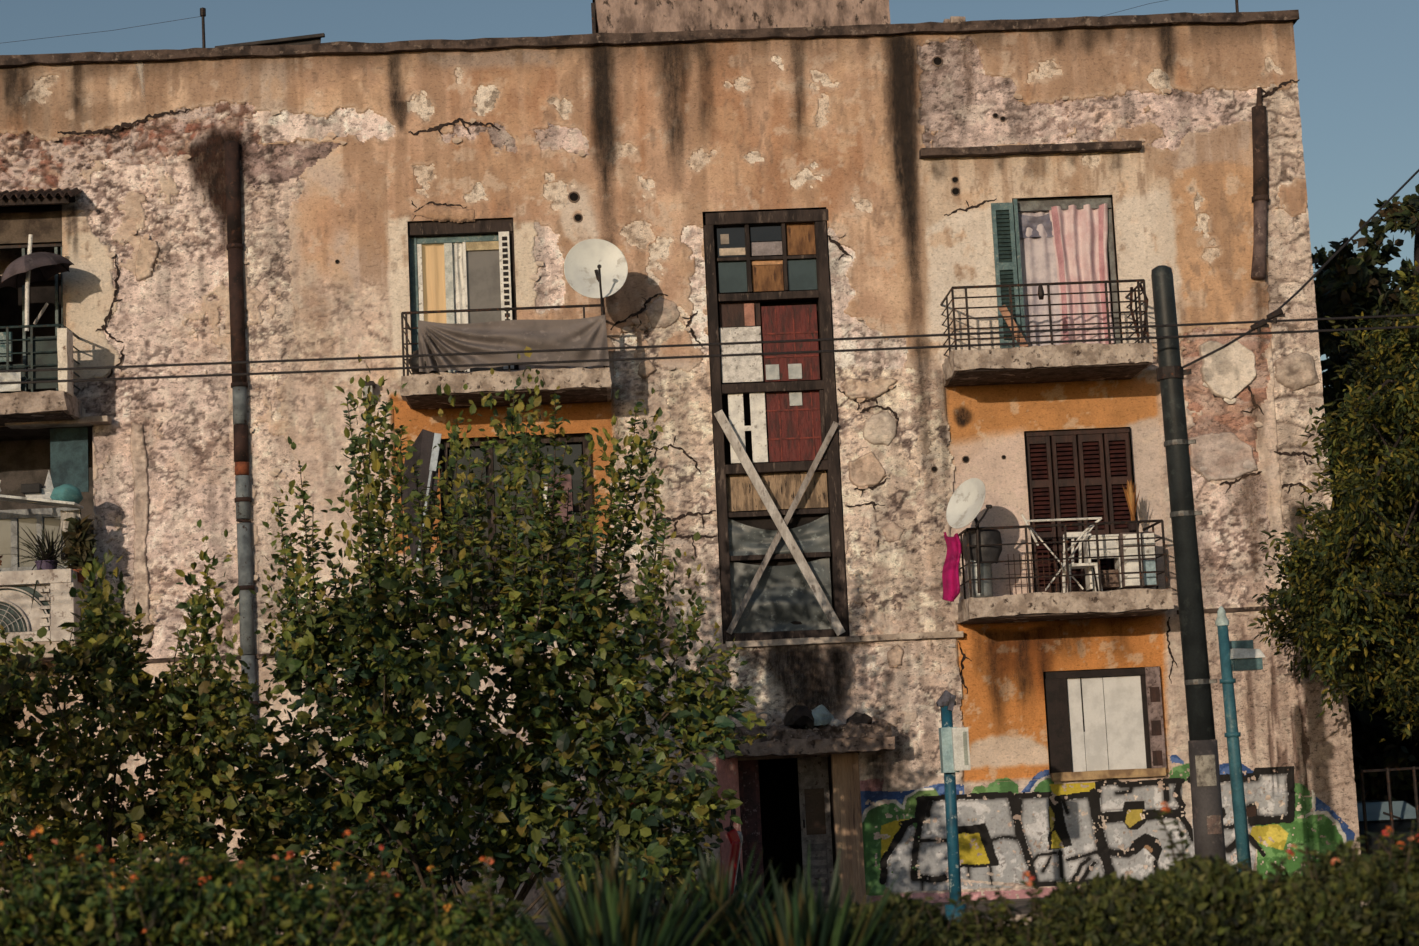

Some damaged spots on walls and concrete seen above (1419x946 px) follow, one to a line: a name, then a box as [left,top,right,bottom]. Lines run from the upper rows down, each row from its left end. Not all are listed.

crack [408,118,500,136]
flaking render [441,85,518,154]
flaking render [534,97,637,164]
leakage [593,45,612,195]
leakage [662,45,682,151]
leakage [888,35,918,293]
flaking render [530,173,583,314]
crack [96,254,126,378]
flaking render [0,101,396,664]
flaking render [916,37,1361,859]
leakage [754,645,845,713]
leakage [988,628,1045,708]